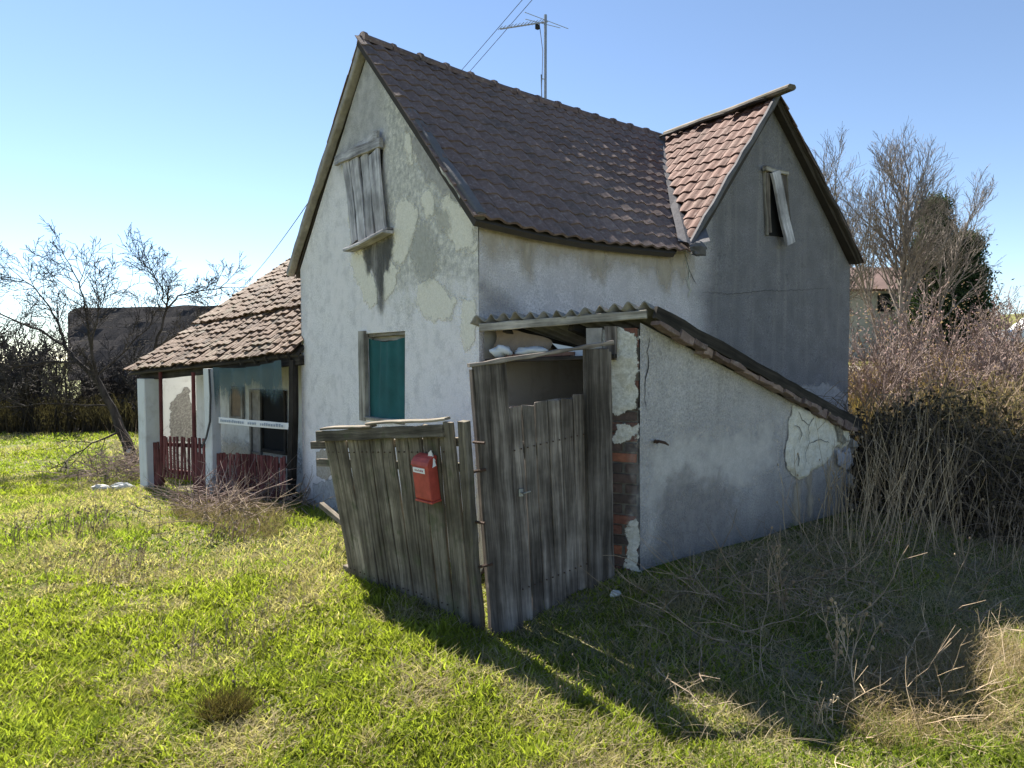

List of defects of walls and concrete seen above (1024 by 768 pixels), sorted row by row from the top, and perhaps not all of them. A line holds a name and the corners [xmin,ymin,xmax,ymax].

peeling [351,132,478,308]
leakage [362,236,393,310]
peeling [416,277,477,351]
peeling [168,387,197,442]
flaking render [602,327,642,572]